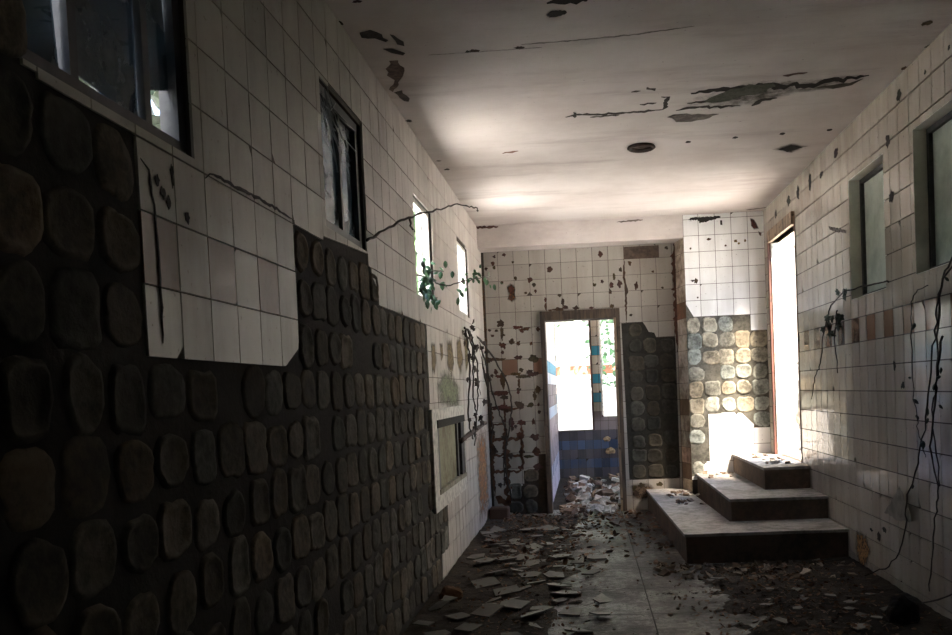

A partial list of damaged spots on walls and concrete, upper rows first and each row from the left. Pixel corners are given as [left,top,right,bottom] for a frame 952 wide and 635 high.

peeling [547,0,588,18]
crack [566,72,869,118]
spalling [500,276,593,311]
peeling [485,319,548,520]
peeling [621,305,771,496]